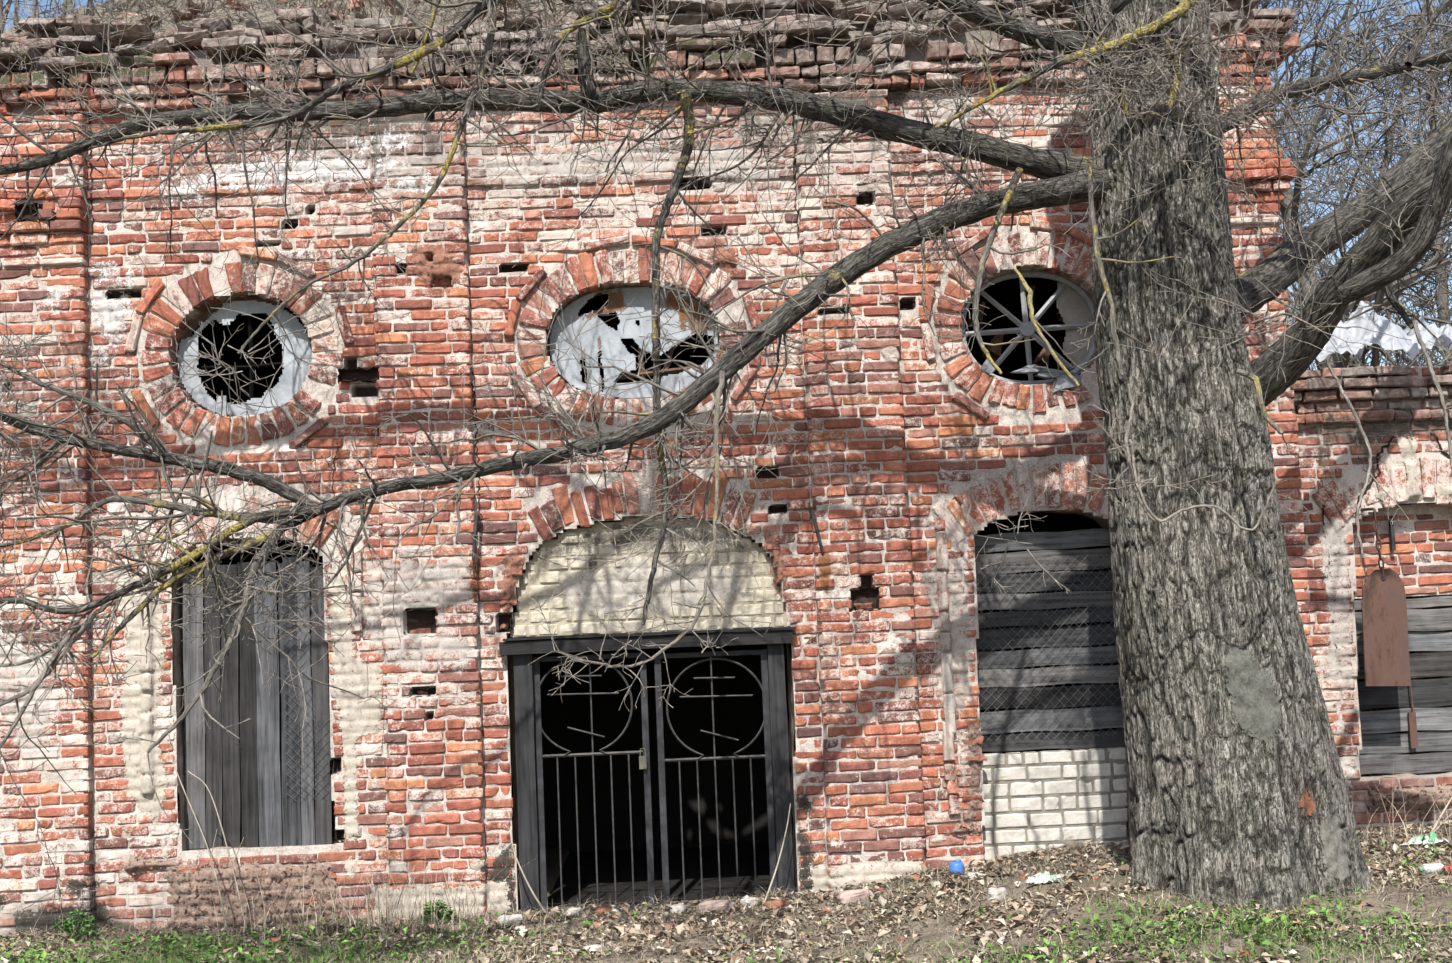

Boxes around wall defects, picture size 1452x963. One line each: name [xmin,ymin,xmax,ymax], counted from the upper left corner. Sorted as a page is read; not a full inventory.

crack [1321,436,1396,675]
crack [1431,431,1450,459]